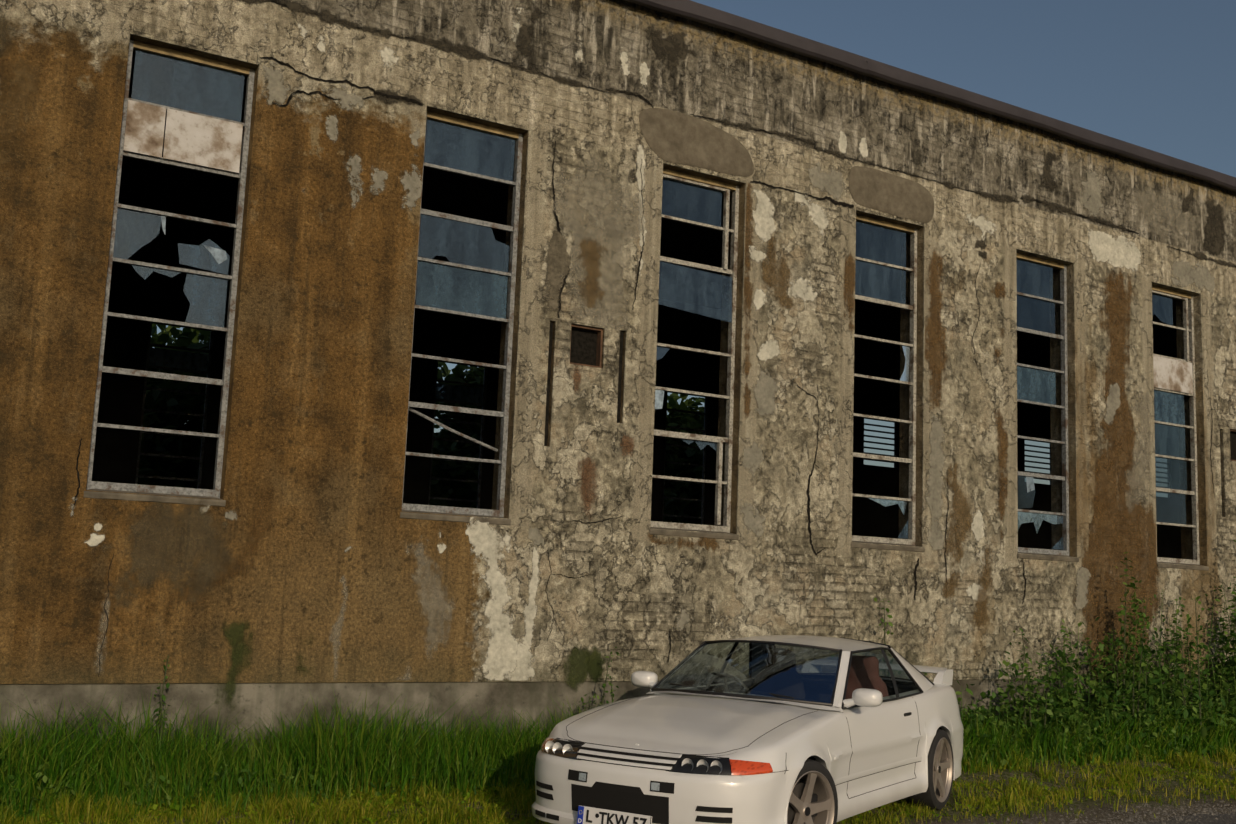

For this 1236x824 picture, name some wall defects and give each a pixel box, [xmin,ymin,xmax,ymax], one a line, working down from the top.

crack [260,57,374,107]
damp [838,131,868,158]
crack [552,141,562,234]
peeling [749,189,776,262]
peeling [794,190,830,236]
damp [966,213,997,239]
damp [1080,169,1141,272]
crack [557,269,570,318]
peeling [754,289,767,310]
peeling [788,278,818,302]
crack [793,379,825,555]
damp [1075,567,1091,610]